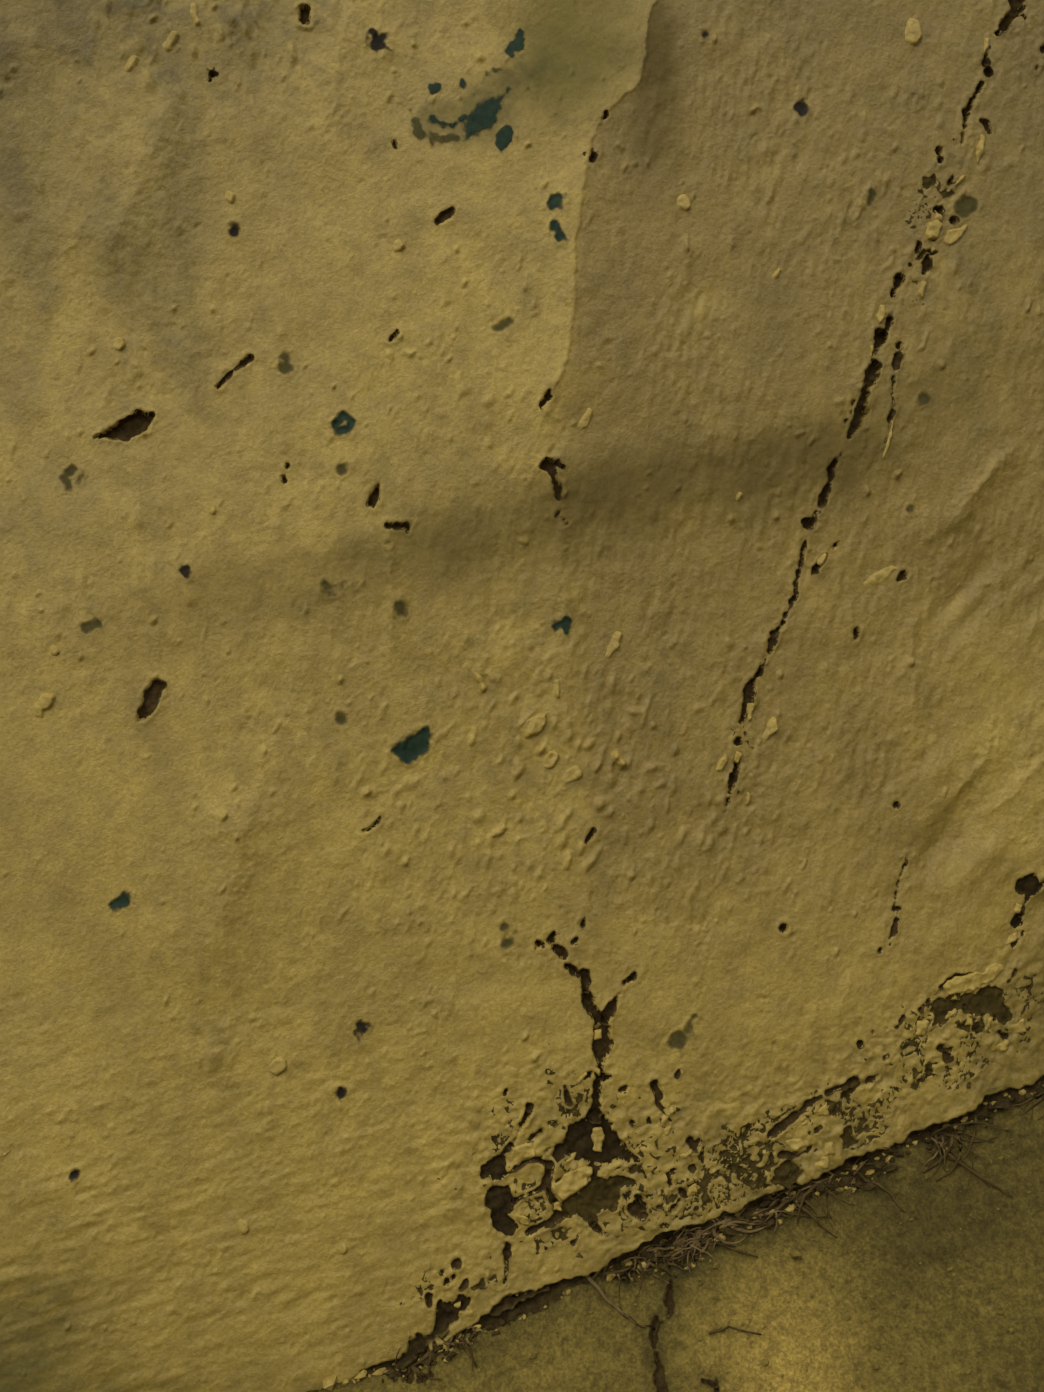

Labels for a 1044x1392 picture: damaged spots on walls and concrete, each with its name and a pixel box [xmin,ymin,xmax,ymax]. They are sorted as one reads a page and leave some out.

crack [716,0,1026,805]
crack [534,913,637,1124]
peeling [396,963,1044,1365]
crack [401,1368,434,1384]
crack [649,1247,675,1392]
crack [701,1378,720,1392]